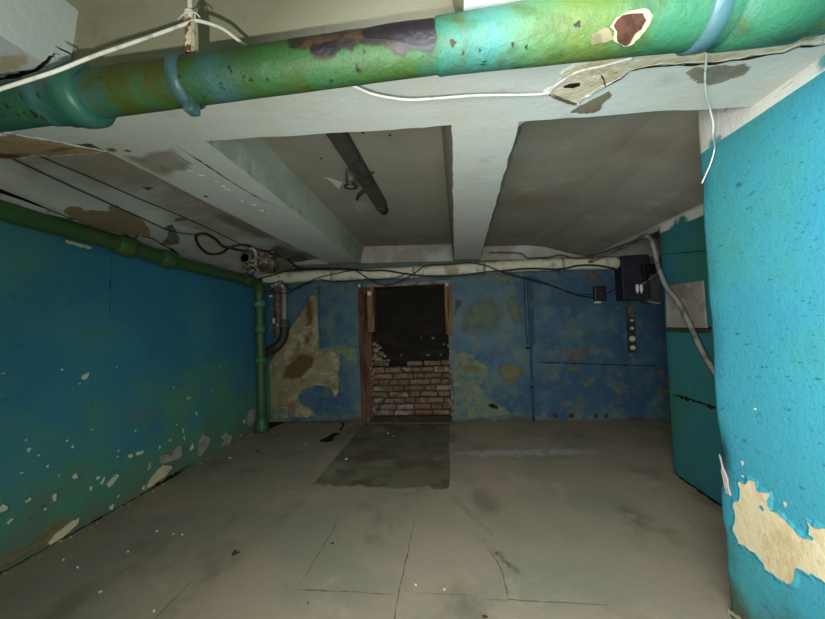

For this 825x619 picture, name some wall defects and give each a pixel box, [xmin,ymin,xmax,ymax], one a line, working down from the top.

peeling [589,9,653,47]
spalling [0,55,54,80]
spalling [542,35,825,106]
damp [686,64,749,85]
spalling [0,132,205,177]
crack [177,146,271,204]
damp [64,206,150,236]
flaking render [269,289,358,422]
flaking render [440,339,522,419]
crack [673,395,716,409]
peeling [117,424,242,490]
peeling [719,454,825,590]